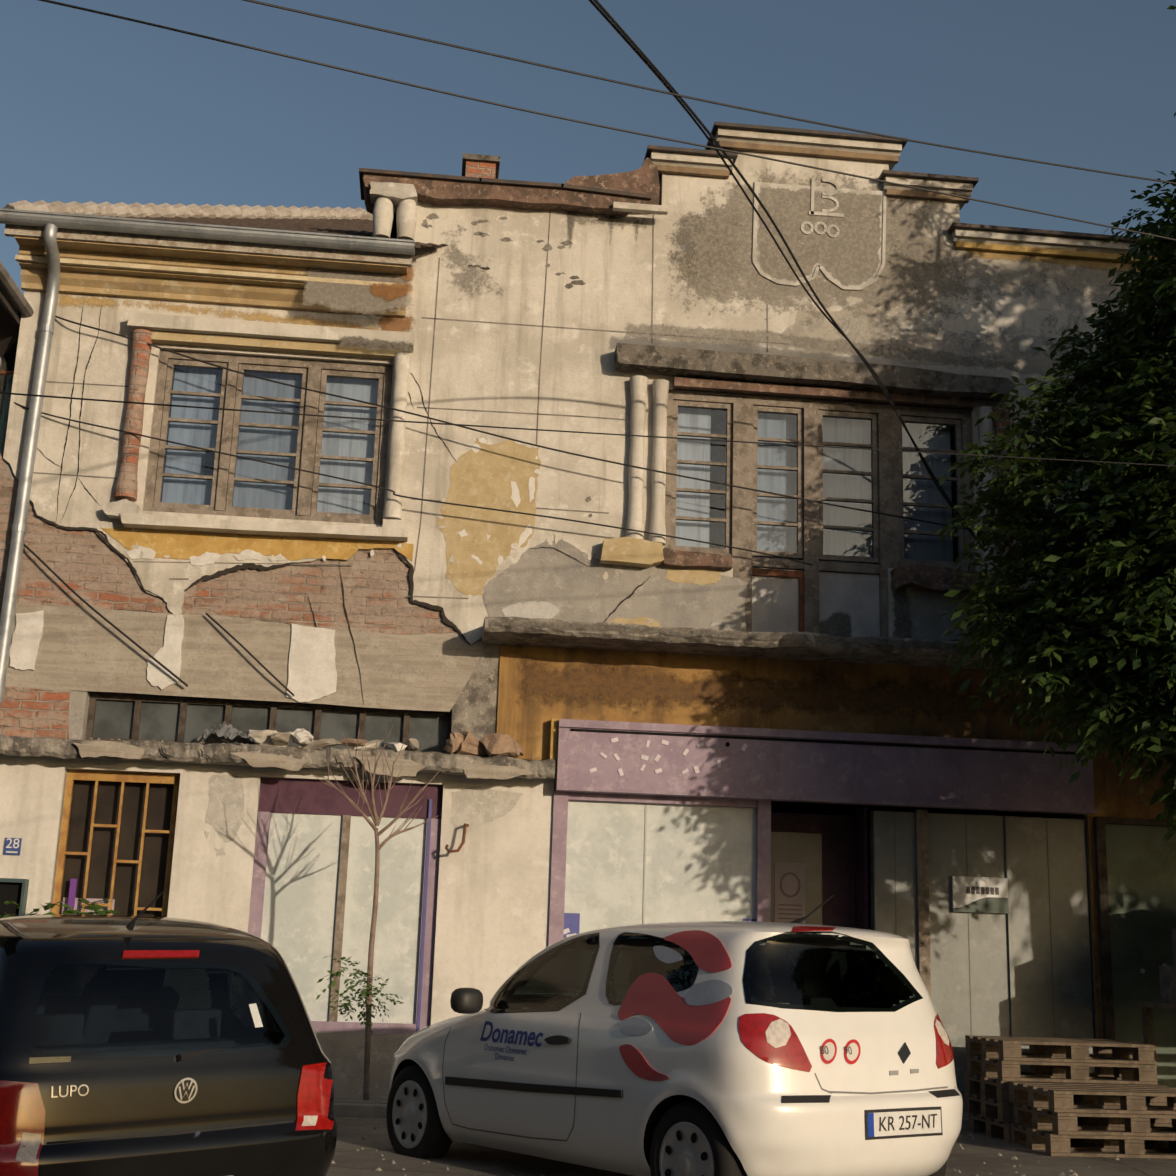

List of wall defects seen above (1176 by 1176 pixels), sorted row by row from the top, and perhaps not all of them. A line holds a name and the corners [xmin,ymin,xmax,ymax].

water stain [626,170,1020,372]
crack [37,294,102,523]
crack [408,373,456,461]
flaking render [0,454,532,833]
peeling [437,438,542,596]
crack [531,547,587,566]
crack [604,577,650,622]
peeling [608,617,660,627]
peeling [665,567,721,585]
water stain [519,660,1077,729]